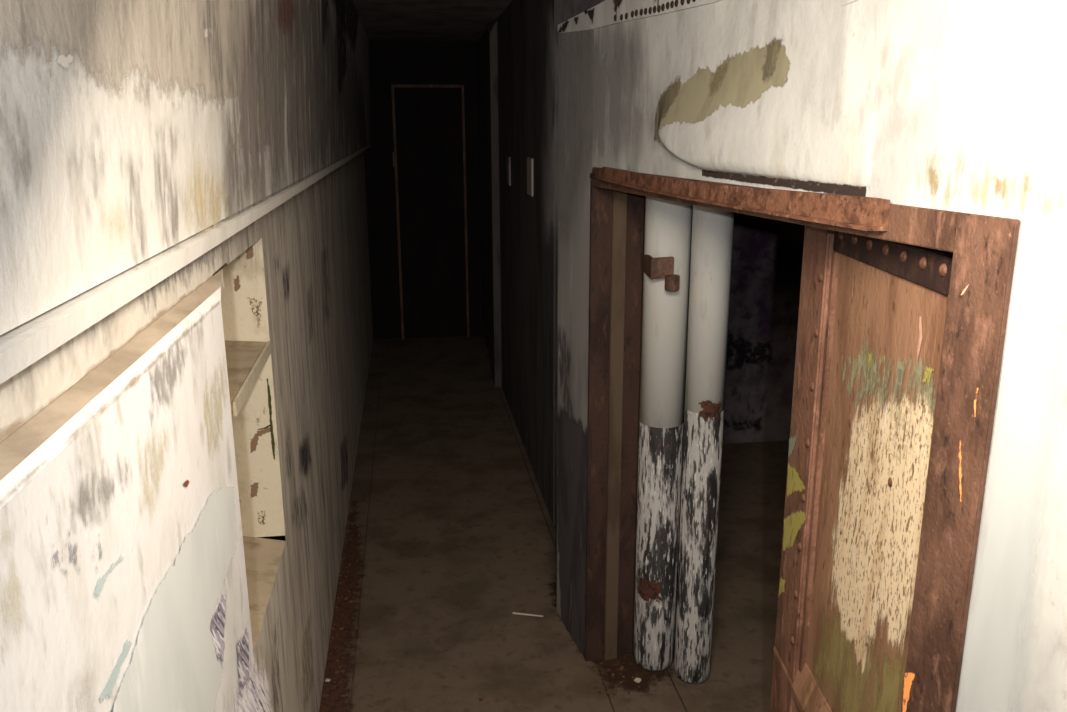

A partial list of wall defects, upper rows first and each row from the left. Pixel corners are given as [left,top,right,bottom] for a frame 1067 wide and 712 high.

peeling [654,39,790,142]
peeling [250,427,270,453]
corrosion [698,400,722,421]
corrosion [637,576,662,603]
peeling [100,640,132,712]
peeling [210,594,273,712]